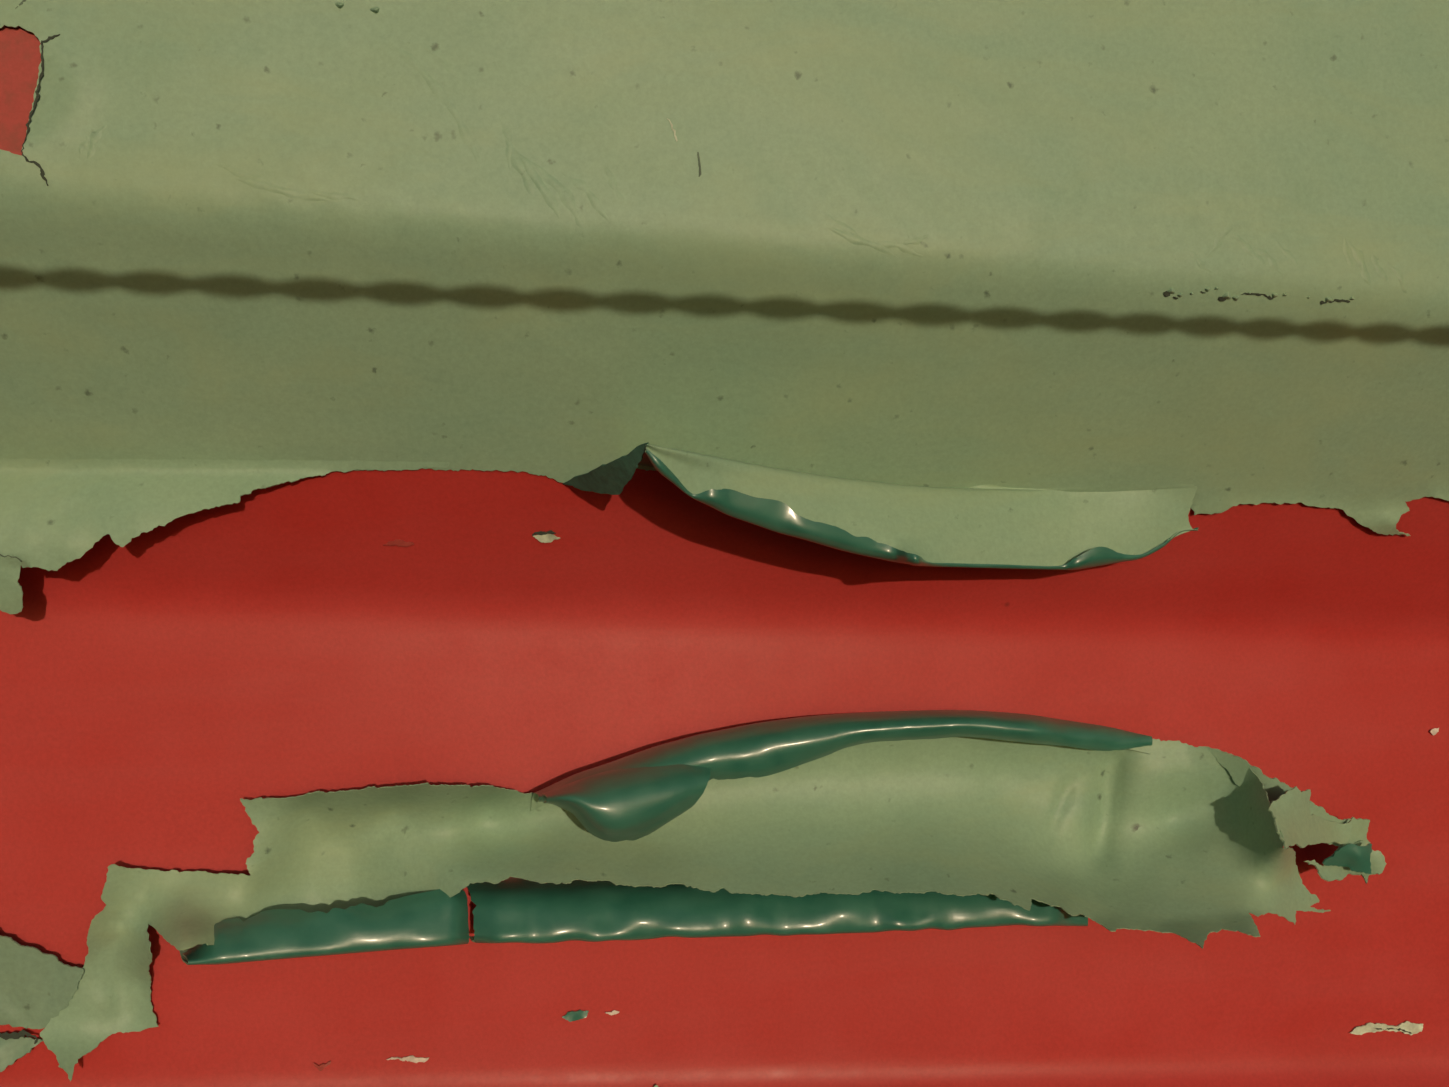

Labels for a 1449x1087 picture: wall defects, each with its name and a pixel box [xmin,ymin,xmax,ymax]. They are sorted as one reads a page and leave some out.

spalling [0,26,44,156]
peeling [0,458,450,614]
peeling [532,530,560,543]
peeling [562,442,1199,570]
peeling [0,710,1387,1081]
peeling [1350,1021,1423,1035]